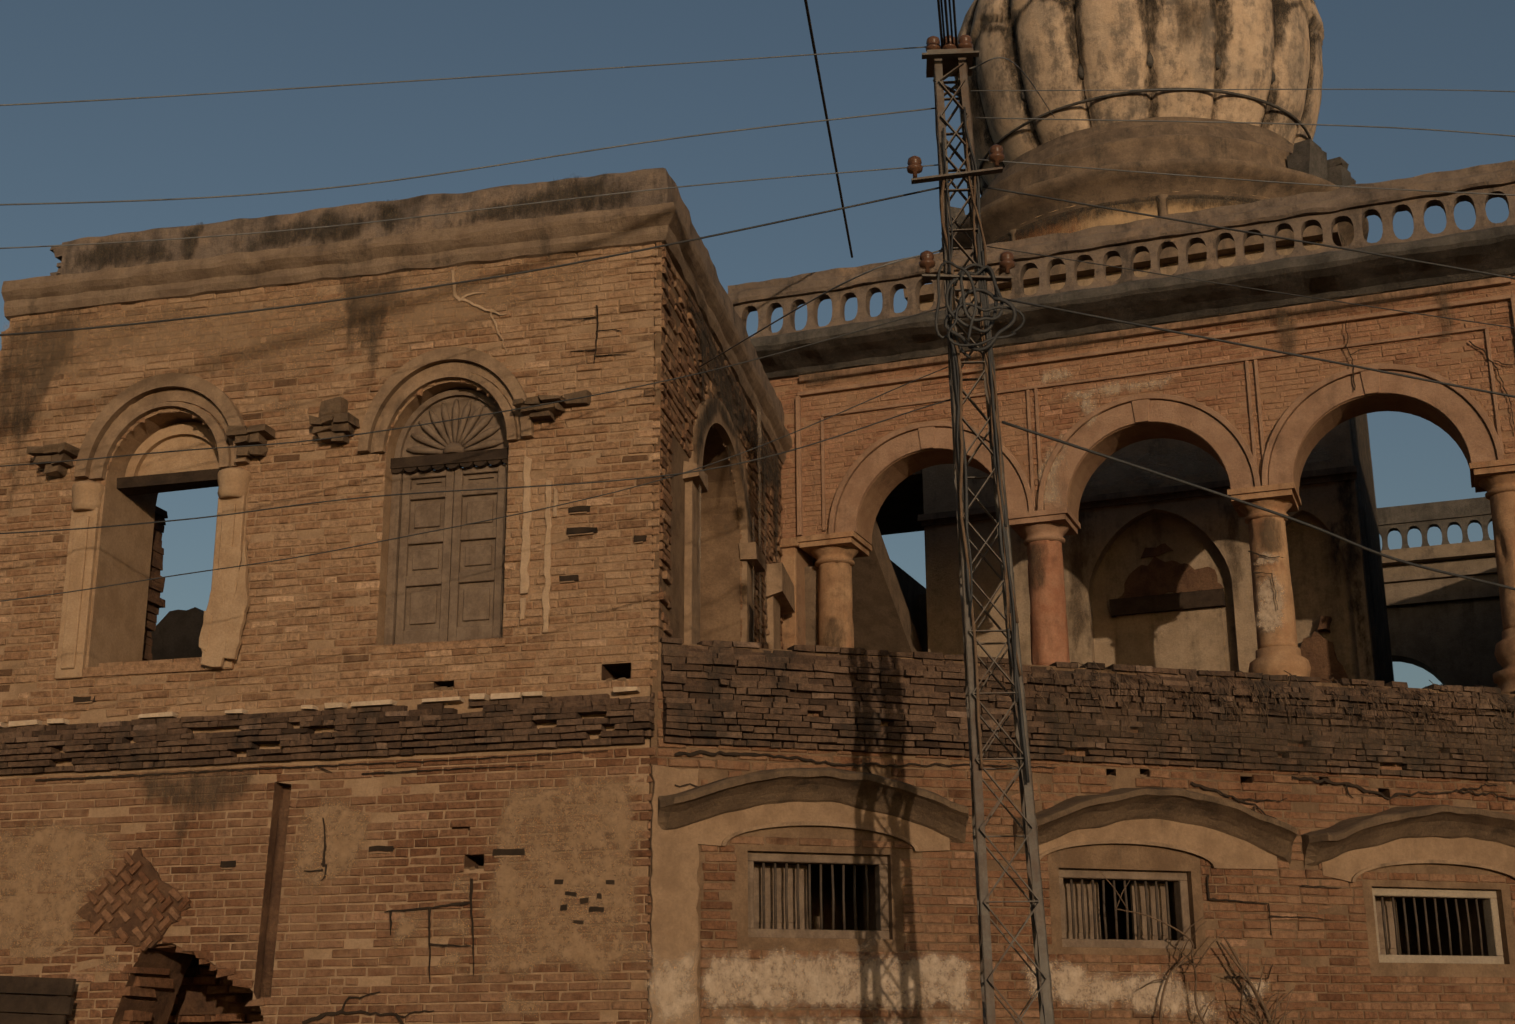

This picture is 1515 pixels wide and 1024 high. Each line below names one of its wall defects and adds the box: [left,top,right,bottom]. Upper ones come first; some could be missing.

leakage [956,0,1041,148]
leakage [1055,0,1091,123]
leakage [1137,0,1233,119]
leakage [1261,0,1322,128]
crack [451,270,507,352]
spalling [76,847,272,1024]
peeling [293,801,394,885]
peeling [438,775,970,1024]
peeling [1027,963,1214,1021]
peeling [1243,980,1265,999]